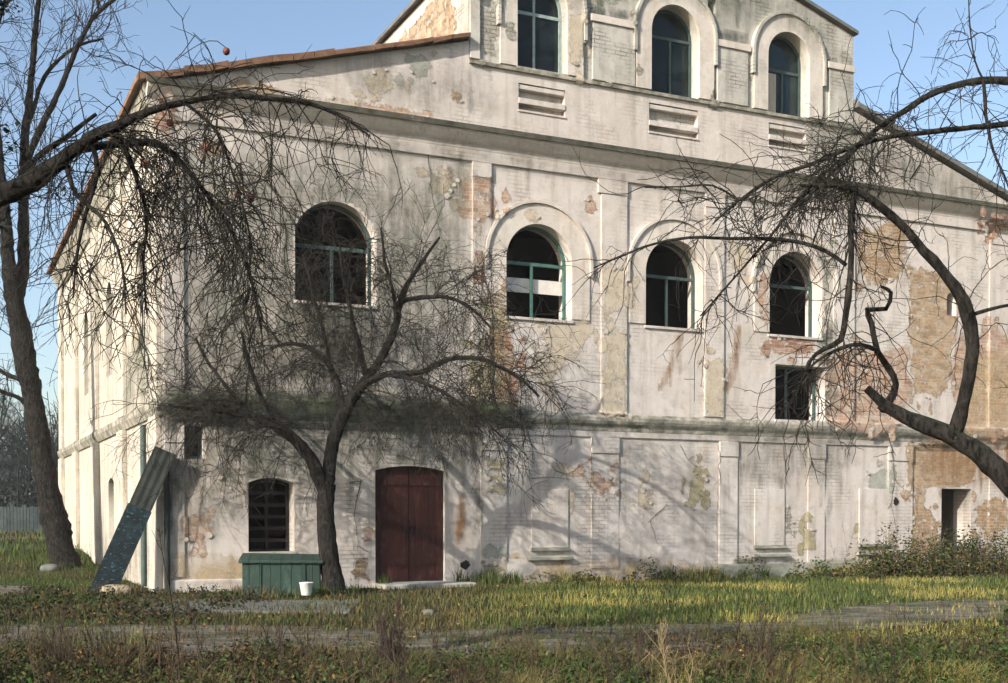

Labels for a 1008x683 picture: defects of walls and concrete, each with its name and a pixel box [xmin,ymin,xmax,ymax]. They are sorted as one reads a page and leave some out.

flaking render [398,0,457,42]
peeling [325,50,437,119]
flaking render [416,166,512,235]
flaking render [975,205,1008,244]
peeling [729,240,769,325]
peeling [462,251,640,423]
flaking render [759,220,966,443]
flaking render [964,316,1008,450]
peeling [680,454,711,510]
flaking render [785,505,816,556]
flaking render [866,440,1008,565]
flaking render [350,557,371,583]